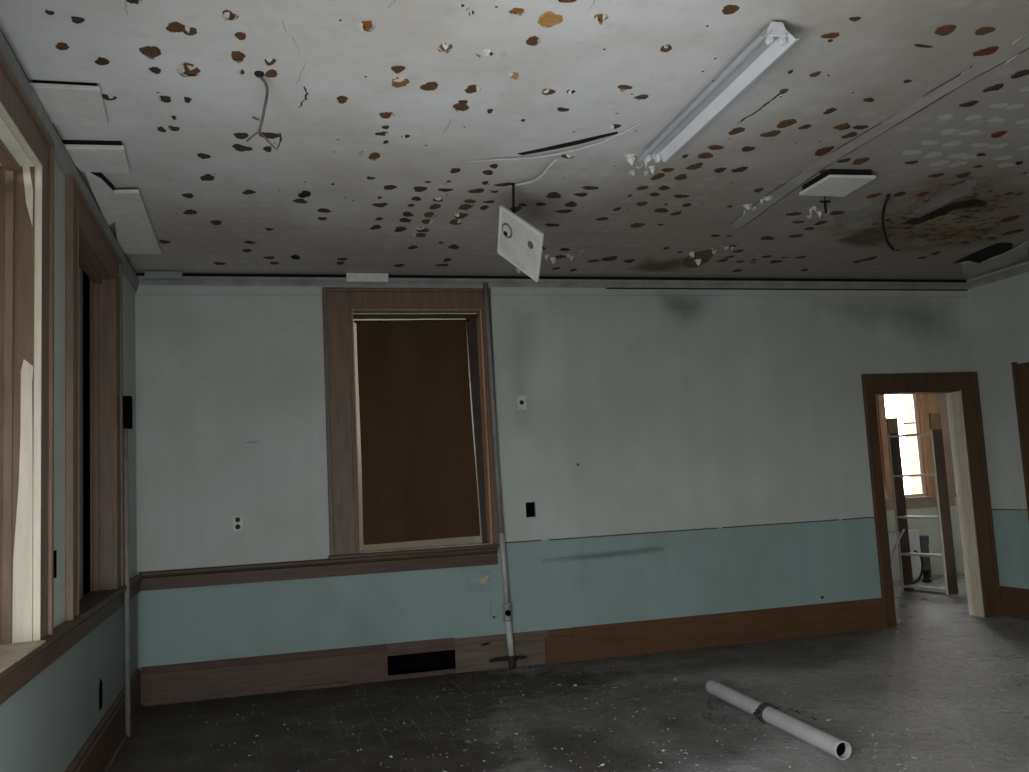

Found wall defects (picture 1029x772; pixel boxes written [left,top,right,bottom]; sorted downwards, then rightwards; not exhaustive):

peeling [22,166,33,223]
leakage [844,175,1013,247]
peeling [912,179,978,216]